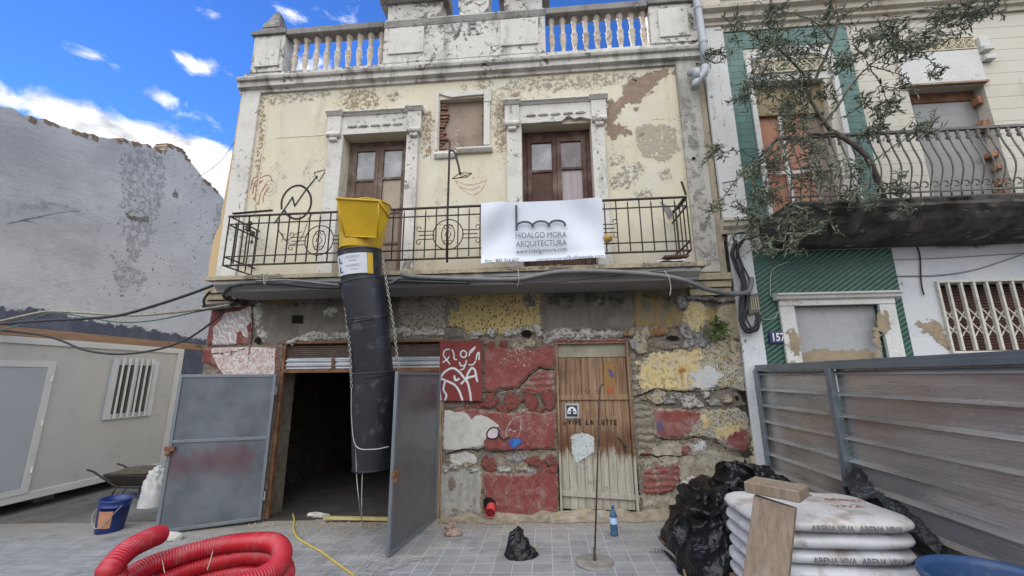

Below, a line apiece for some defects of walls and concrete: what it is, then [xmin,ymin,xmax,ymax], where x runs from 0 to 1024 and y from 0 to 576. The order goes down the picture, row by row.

peeling [474,67,680,197]
hole [126,211,149,223]
peeling [251,303,269,344]
peeling [283,315,348,346]
spalling [390,291,747,414]
peeling [786,327,802,356]
peeling [872,310,893,358]
peeling [915,319,950,350]